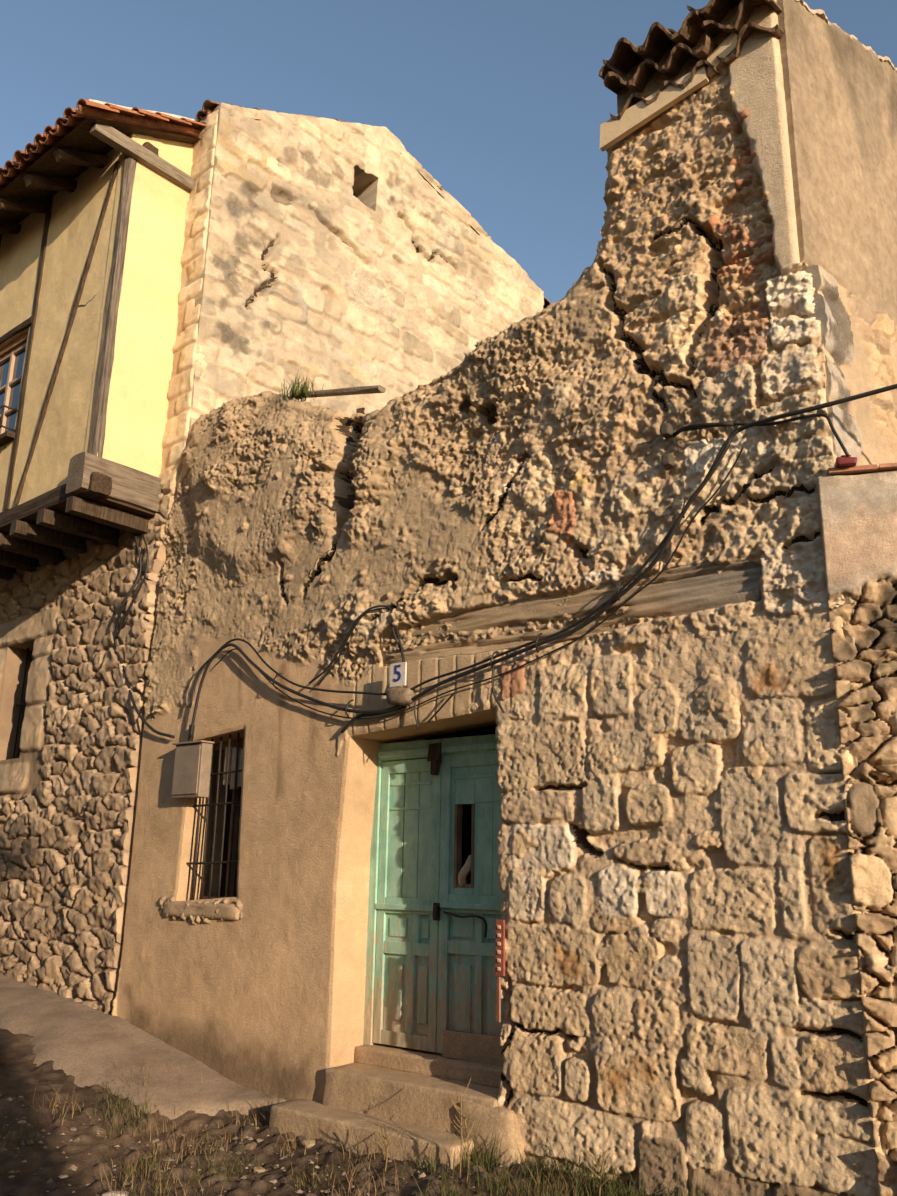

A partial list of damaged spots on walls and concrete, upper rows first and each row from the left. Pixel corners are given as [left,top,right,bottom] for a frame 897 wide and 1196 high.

spalling [270,190,293,205]
spalling [664,89,777,369]
crack [603,216,725,411]
crack [334,407,365,484]
spalling [457,399,499,426]
spalling [334,494,356,511]
peeling [506,451,589,559]
crack [279,531,342,604]